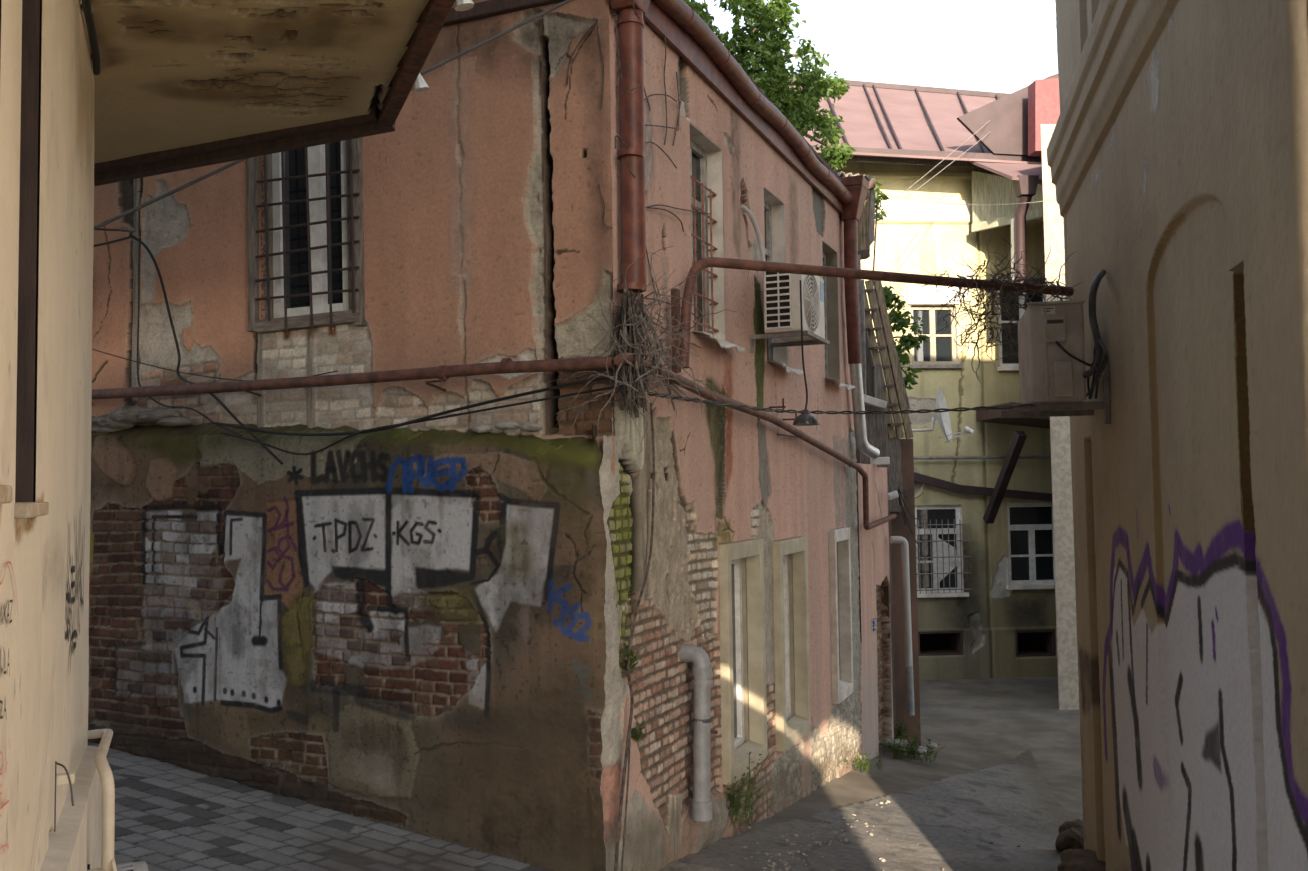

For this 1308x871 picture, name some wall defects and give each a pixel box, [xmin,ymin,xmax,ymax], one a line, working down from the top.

crack [554,19,598,120]
crack [455,23,471,433]
crack [554,248,580,256]
flaking render [88,177,778,871]
crack [531,456,597,613]